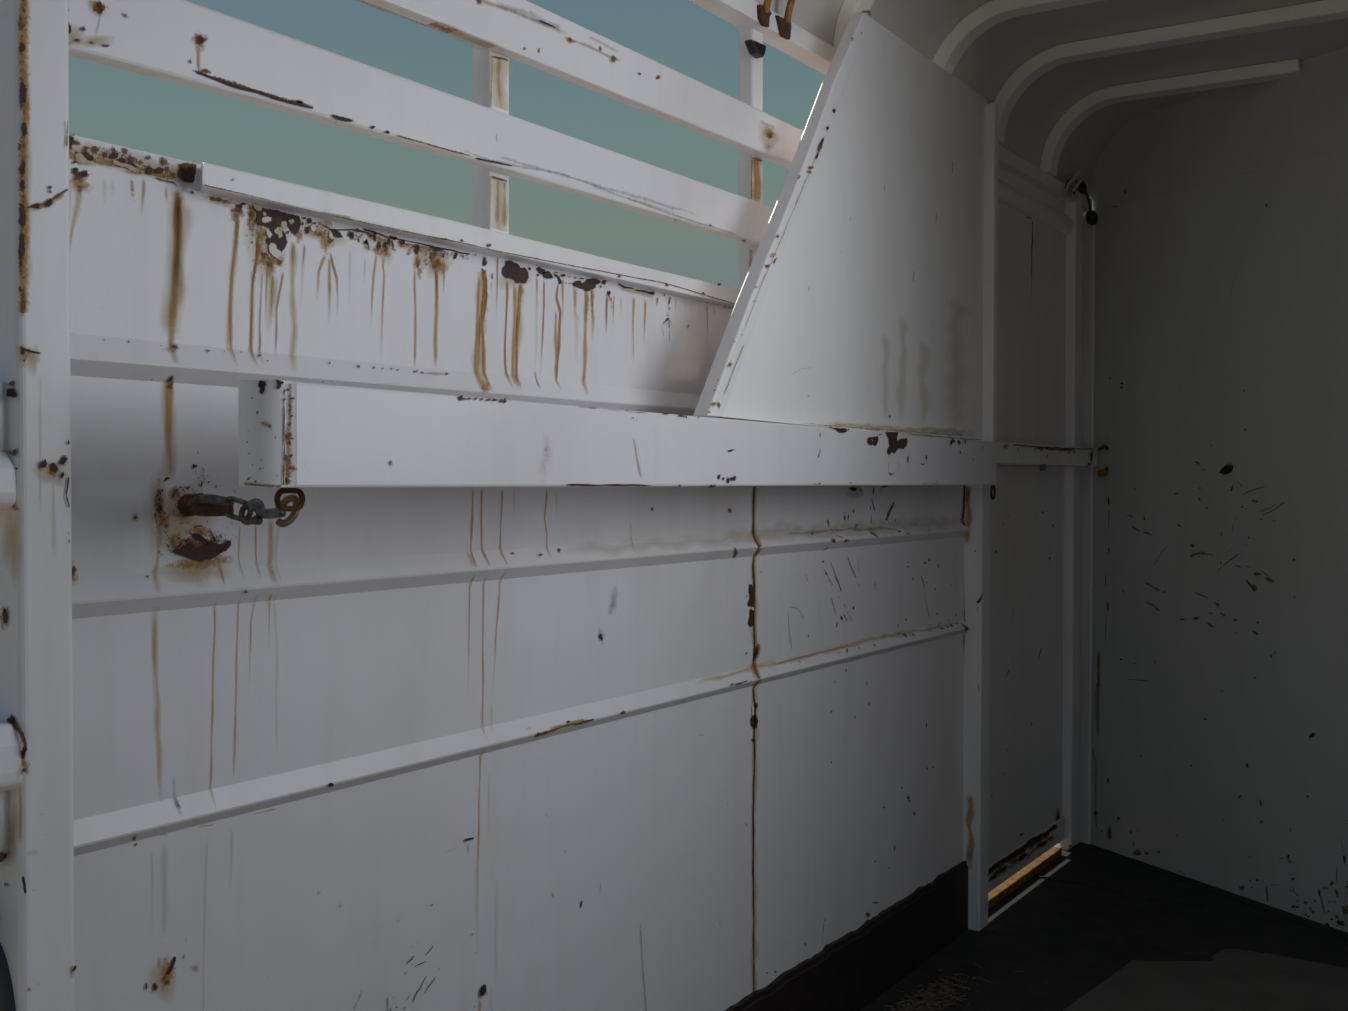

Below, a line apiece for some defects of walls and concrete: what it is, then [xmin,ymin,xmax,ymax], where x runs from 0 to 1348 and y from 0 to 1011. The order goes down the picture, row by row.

corrosion [190,34,313,109]
corrosion [18,0,29,316]
corrosion [69,126,734,403]
peeling [502,260,606,386]
corrosion [151,376,174,435]
corrosion [234,384,296,493]
peeling [868,415,928,465]
corrosion [155,452,272,580]
corrosion [471,491,514,563]
corrosion [234,590,271,767]
corrosion [469,575,504,724]